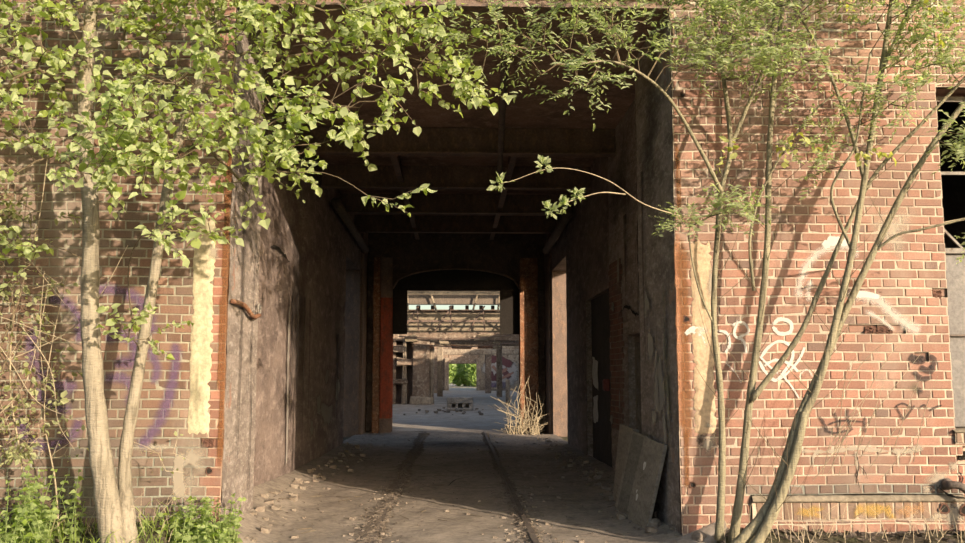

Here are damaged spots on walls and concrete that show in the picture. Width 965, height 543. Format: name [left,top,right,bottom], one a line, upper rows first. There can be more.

rust [675,241,692,486]